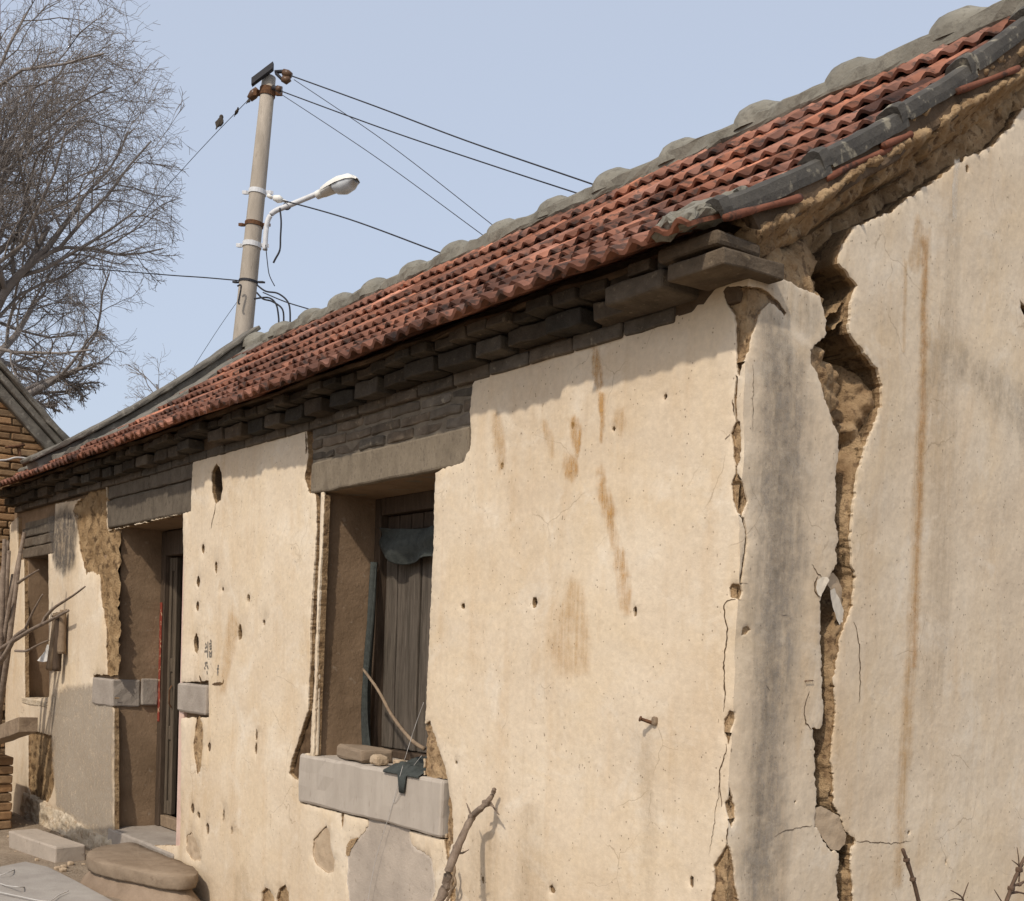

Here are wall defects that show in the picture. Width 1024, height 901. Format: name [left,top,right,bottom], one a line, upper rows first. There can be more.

spalling [759,86,1024,331]
spalling [73,489,122,677]
crack [723,599,734,712]
water stain [750,325,801,901]
crack [775,302,909,901]
peeling [20,732,112,849]
peeling [313,819,435,901]
crack [709,746,728,852]